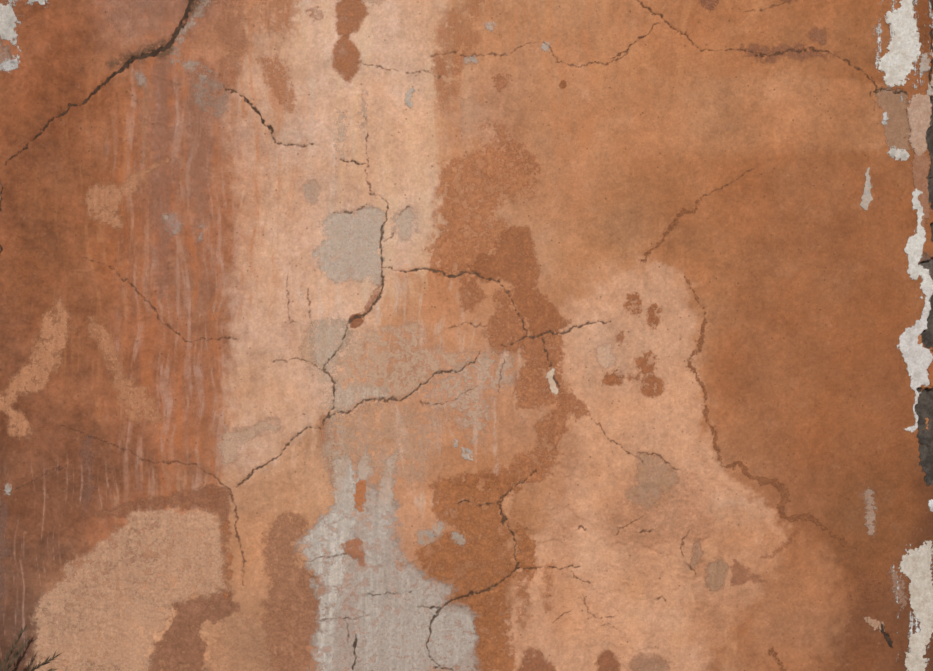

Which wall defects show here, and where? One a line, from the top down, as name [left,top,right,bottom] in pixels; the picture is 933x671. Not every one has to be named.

peeling [0,0,49,72]
crack [0,0,194,211]
crack [225,89,314,147]
water stain [333,0,368,81]
peeling [312,205,418,285]
peeling [860,167,873,210]
peeling [875,0,933,486]
crack [89,160,611,561]
crack [684,276,859,551]
crack [426,470,580,670]
peeling [863,488,877,536]
peeling [888,540,933,671]